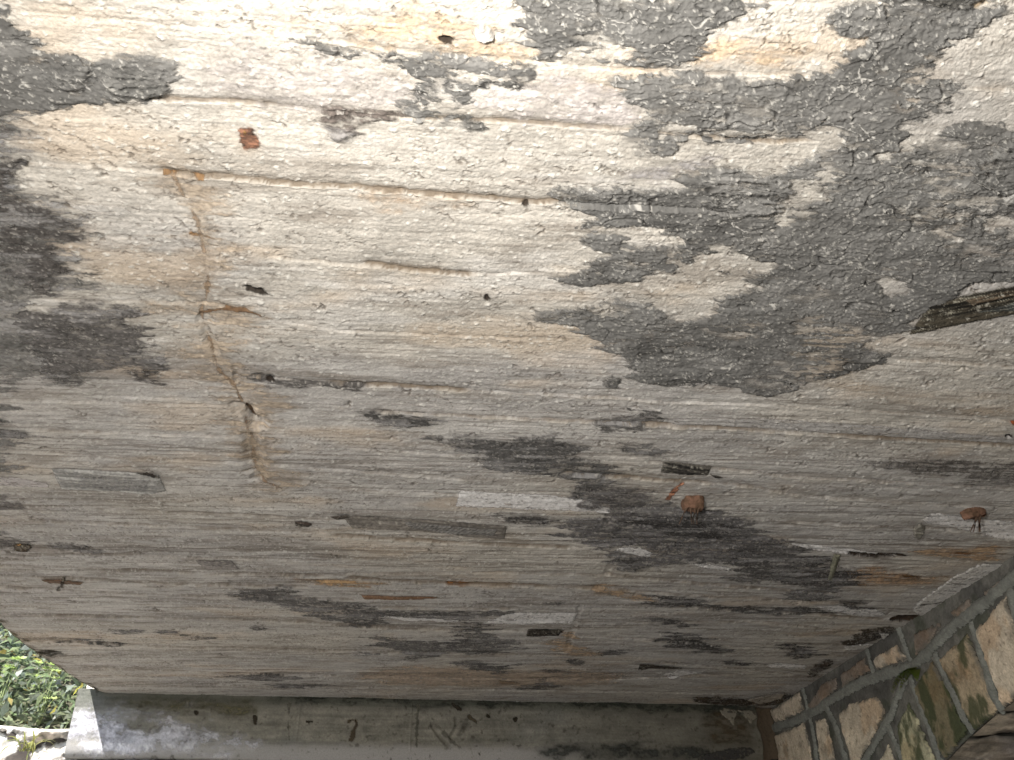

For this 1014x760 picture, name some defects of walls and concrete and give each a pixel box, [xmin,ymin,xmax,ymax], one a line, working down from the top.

water stain [825,0,889,38]
water stain [207,47,417,112]
rust [238,128,260,149]
water stain [0,126,84,296]
crack [163,169,280,488]
water stain [493,513,558,527]
water stain [576,485,749,541]